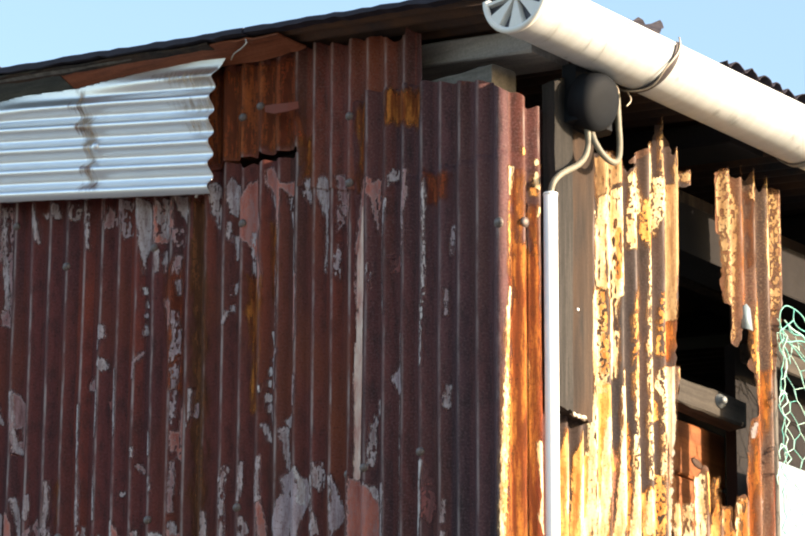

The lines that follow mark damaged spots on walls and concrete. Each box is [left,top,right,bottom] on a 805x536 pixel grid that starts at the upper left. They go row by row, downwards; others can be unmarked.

corrosion [207,58,312,179]
corrosion [384,88,420,127]
corrosion [423,171,448,205]
peeling [0,389,26,455]
peeling [90,324,115,437]
peeling [101,195,199,536]
corrosion [164,197,209,536]
peeling [207,167,409,536]
corrosion [506,171,544,536]
peeling [560,115,750,536]
corrosion [665,321,676,362]
peeling [0,481,50,536]